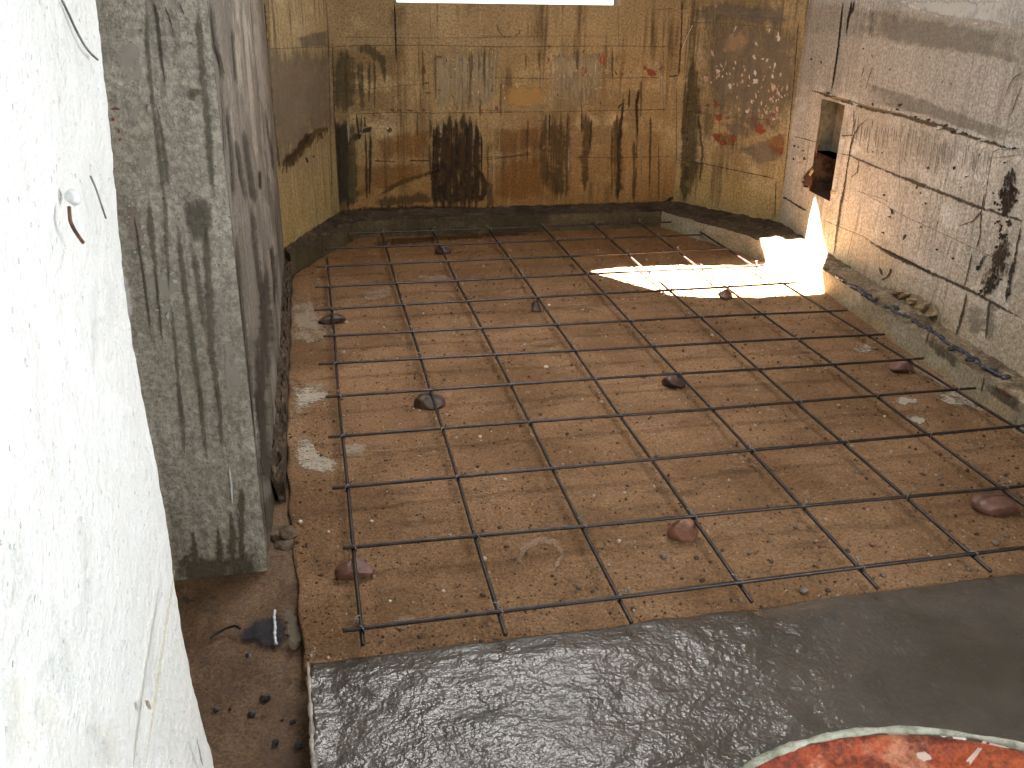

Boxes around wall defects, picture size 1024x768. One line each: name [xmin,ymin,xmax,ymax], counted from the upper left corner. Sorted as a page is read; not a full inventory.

water stain [145,5,174,187]
water stain [190,14,214,185]
water stain [527,89,592,196]
water stain [610,49,704,203]
peeling [704,19,795,163]
water stain [135,201,223,455]
water stain [227,32,502,531]
water stain [978,168,1021,301]